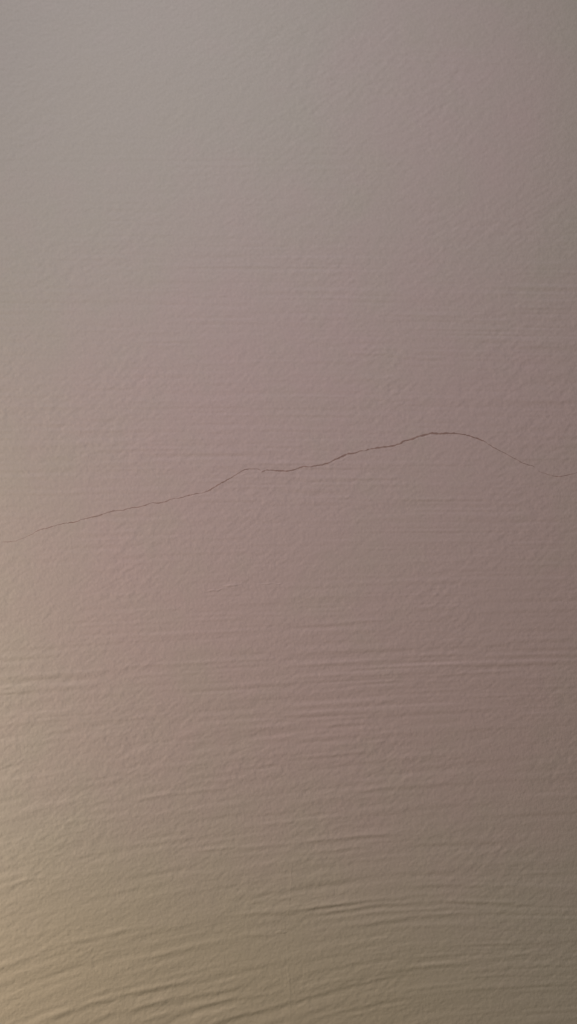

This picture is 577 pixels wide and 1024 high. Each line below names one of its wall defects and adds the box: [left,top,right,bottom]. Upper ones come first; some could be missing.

crack [10,432,575,542]